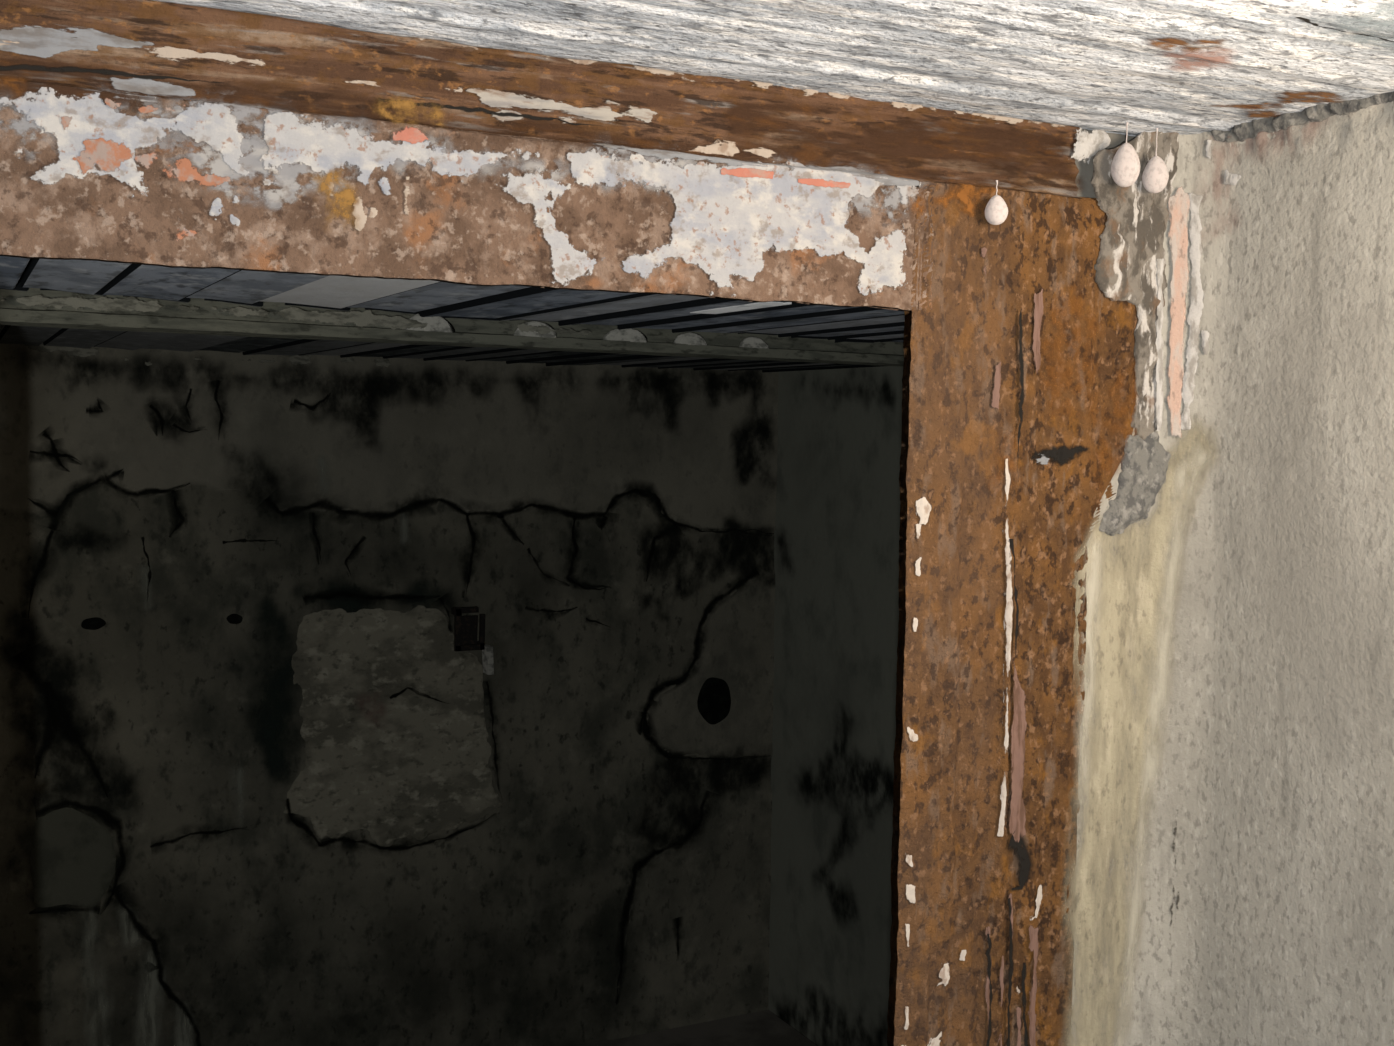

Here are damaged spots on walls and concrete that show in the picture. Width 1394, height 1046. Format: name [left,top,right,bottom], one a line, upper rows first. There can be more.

corrosion [0,58,415,122]
corrosion [315,172,357,219]
peeling [0,77,921,314]
corrosion [480,104,1077,215]
damp [328,358,443,443]
damp [706,370,772,483]
spalling [1068,128,1190,536]
crack [23,429,190,618]
crack [222,485,774,632]
damp [1068,193,1211,1046]
flaking render [283,605,502,847]
crack [28,801,249,1046]